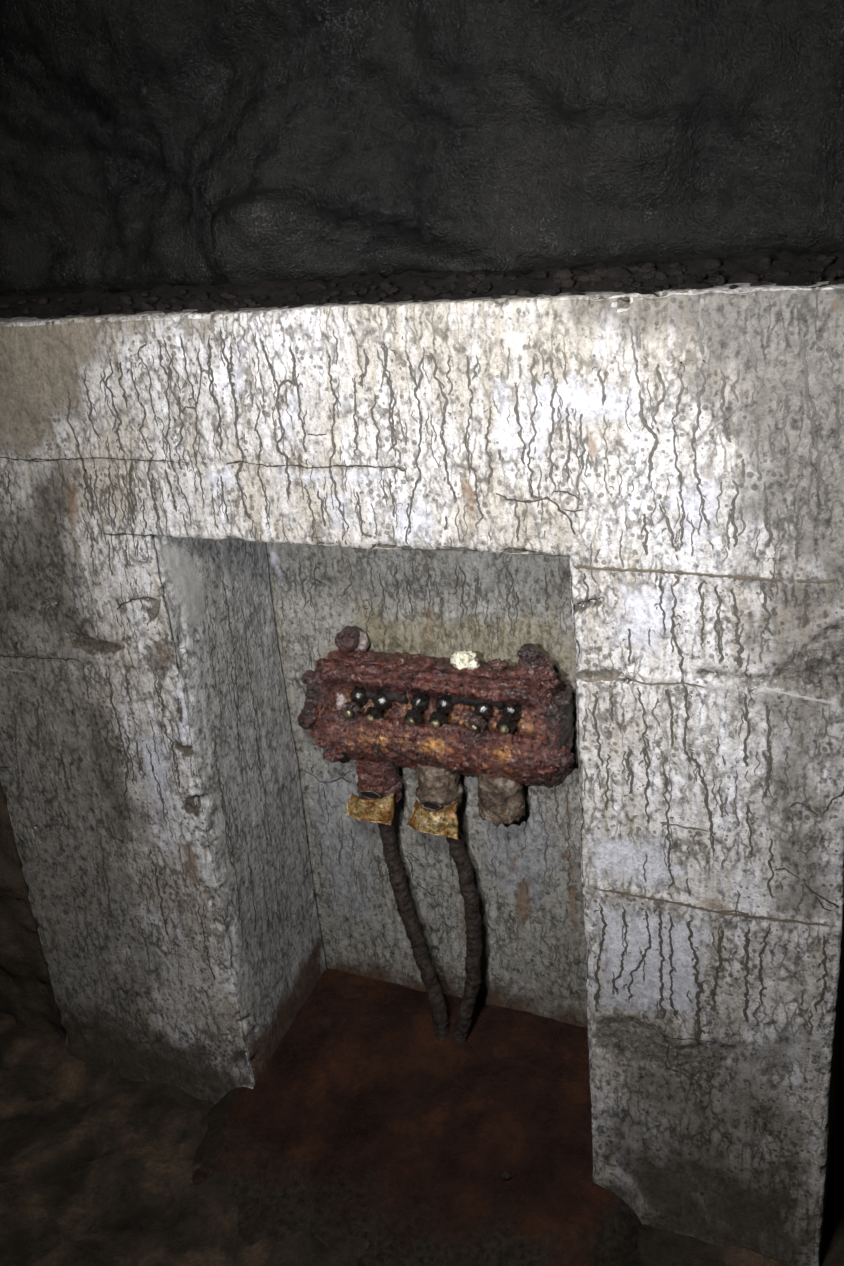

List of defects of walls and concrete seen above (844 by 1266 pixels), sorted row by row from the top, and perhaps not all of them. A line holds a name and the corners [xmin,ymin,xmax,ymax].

crack [0,455,182,463]
crack [227,460,412,471]
crack [496,480,583,535]
crack [104,533,154,563]
crack [575,565,837,586]
crack [116,597,152,627]
crack [582,669,715,688]
water stain [0,290,844,1198]
crack [306,766,351,798]
crack [790,786,844,815]
crack [661,822,714,856]
crack [598,867,839,926]